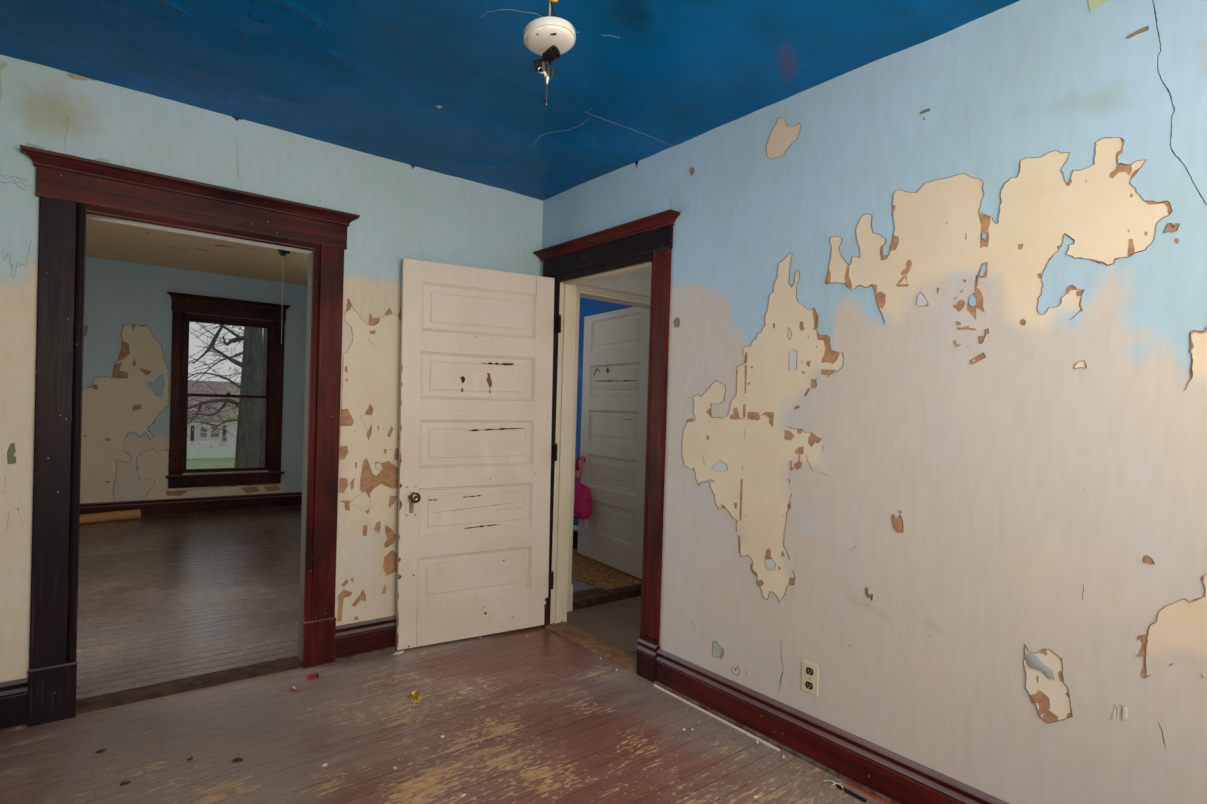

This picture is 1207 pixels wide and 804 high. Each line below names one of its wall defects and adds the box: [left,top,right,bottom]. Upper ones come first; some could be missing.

peeling [766,117,801,159]
crack [1152,0,1207,205]
peeling [825,137,1180,364]
peeling [80,325,284,503]
peeling [337,299,414,647]
peeling [681,253,844,603]
peeling [1184,328,1207,395]
peeling [1023,645,1073,724]
peeling [1136,574,1207,678]